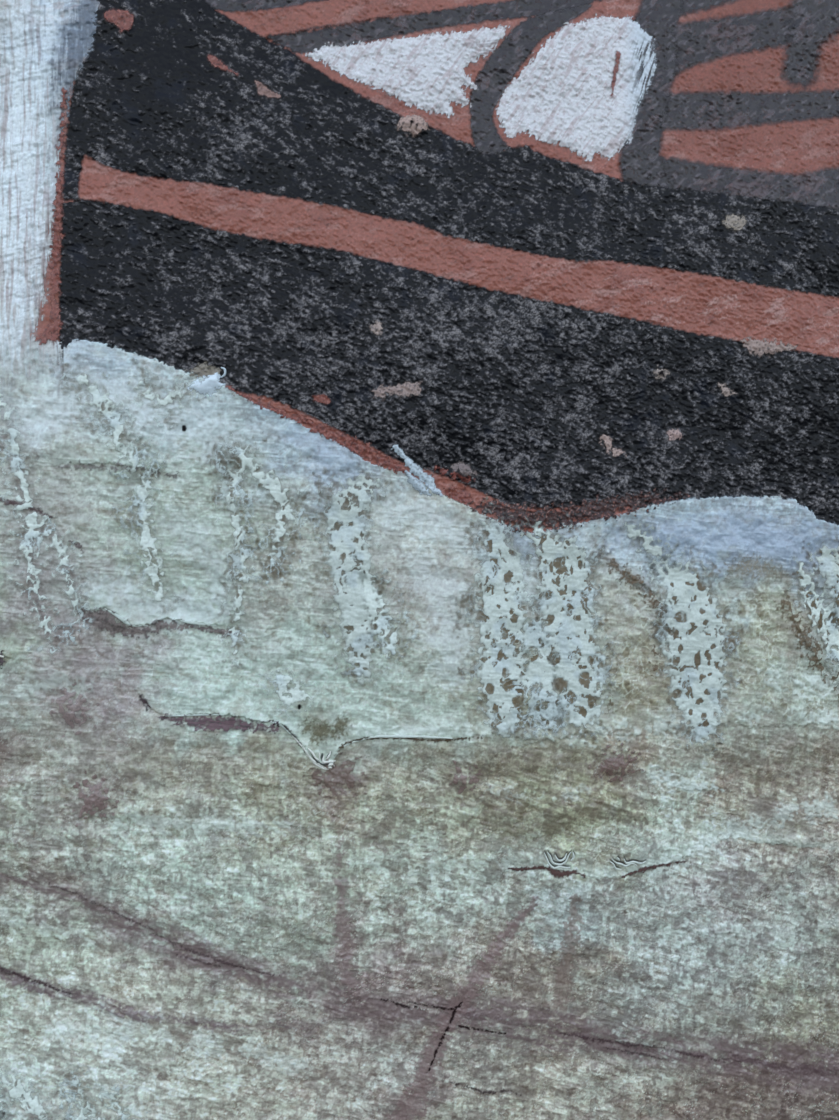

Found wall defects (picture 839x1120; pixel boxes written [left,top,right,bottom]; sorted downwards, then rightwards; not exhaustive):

peeling [0,360,743,751]
crack [508,866,586,878]
crack [621,860,686,878]
crack [381,999,521,1096]
peeling [0,1072,135,1120]